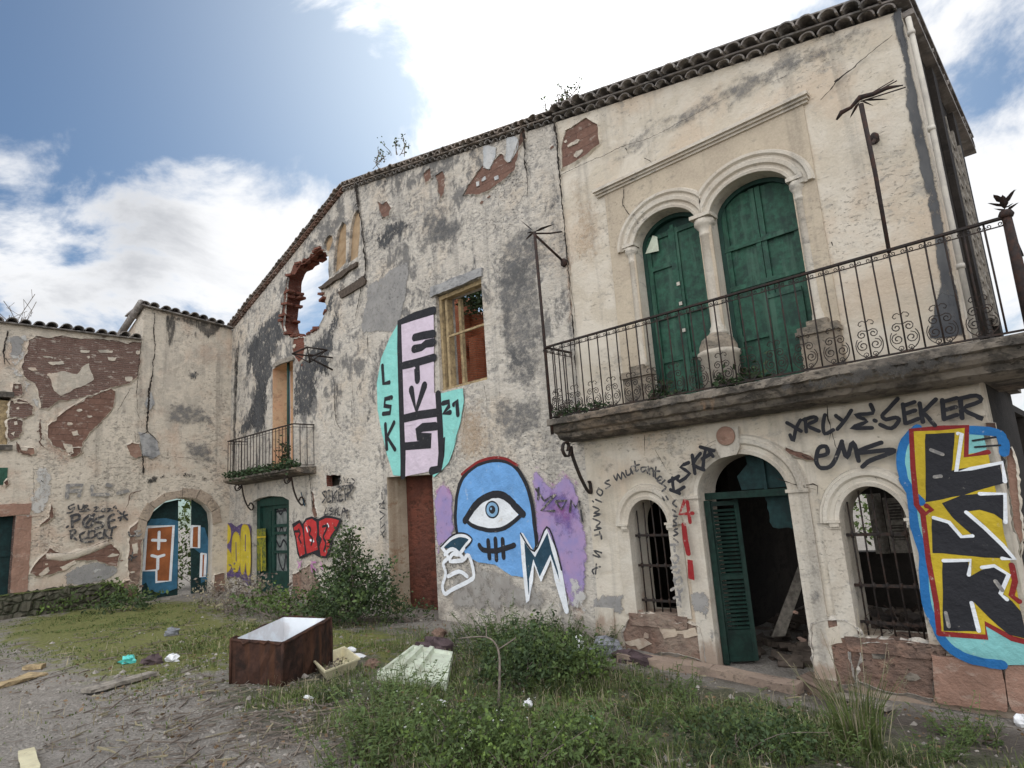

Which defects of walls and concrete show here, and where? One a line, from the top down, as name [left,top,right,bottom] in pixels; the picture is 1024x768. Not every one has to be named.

crack [822,38,889,98]
flaking render [422,166,448,202]
flaking render [462,129,528,204]
flaking render [550,116,602,171]
crack [552,97,728,402]
leakage [499,228,544,386]
flaking render [4,334,142,460]
crack [120,313,206,509]
leakage [232,306,283,470]
flaking render [29,521,143,599]
flaking render [621,609,706,663]